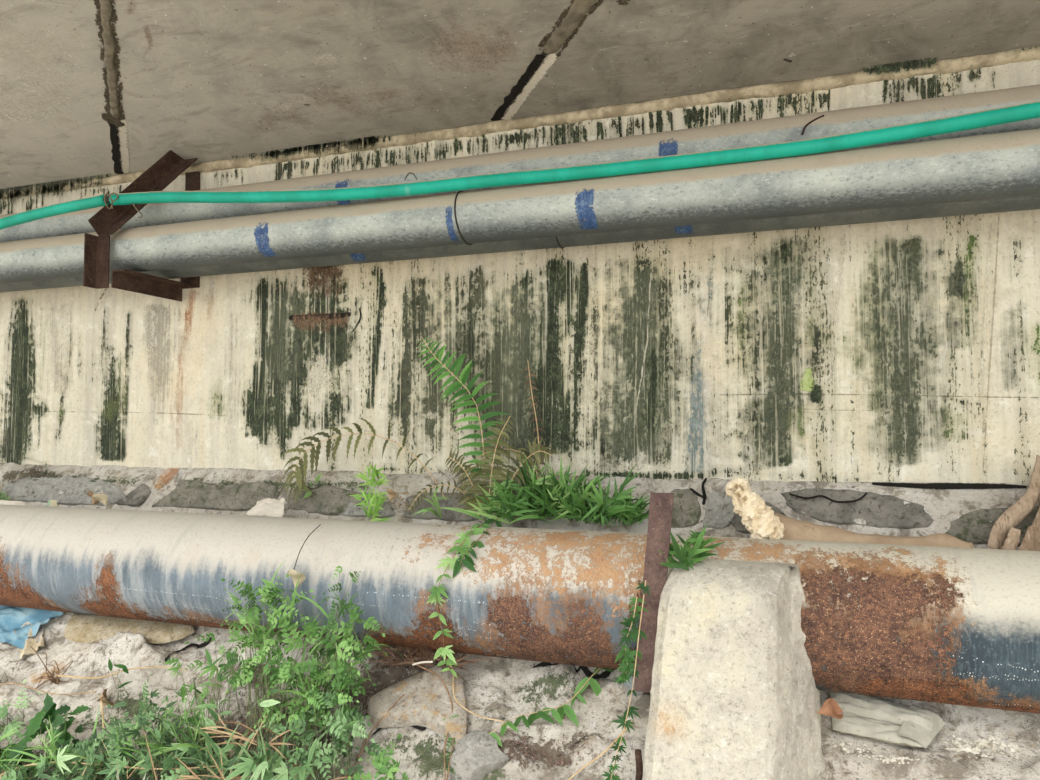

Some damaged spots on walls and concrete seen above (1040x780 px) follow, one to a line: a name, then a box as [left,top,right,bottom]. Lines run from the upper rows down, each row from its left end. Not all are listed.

damp [214,89,830,181]
damp [958,68,995,87]
damp [0,298,133,488]
rust [303,265,343,297]
damp [241,236,850,480]
damp [847,223,993,464]